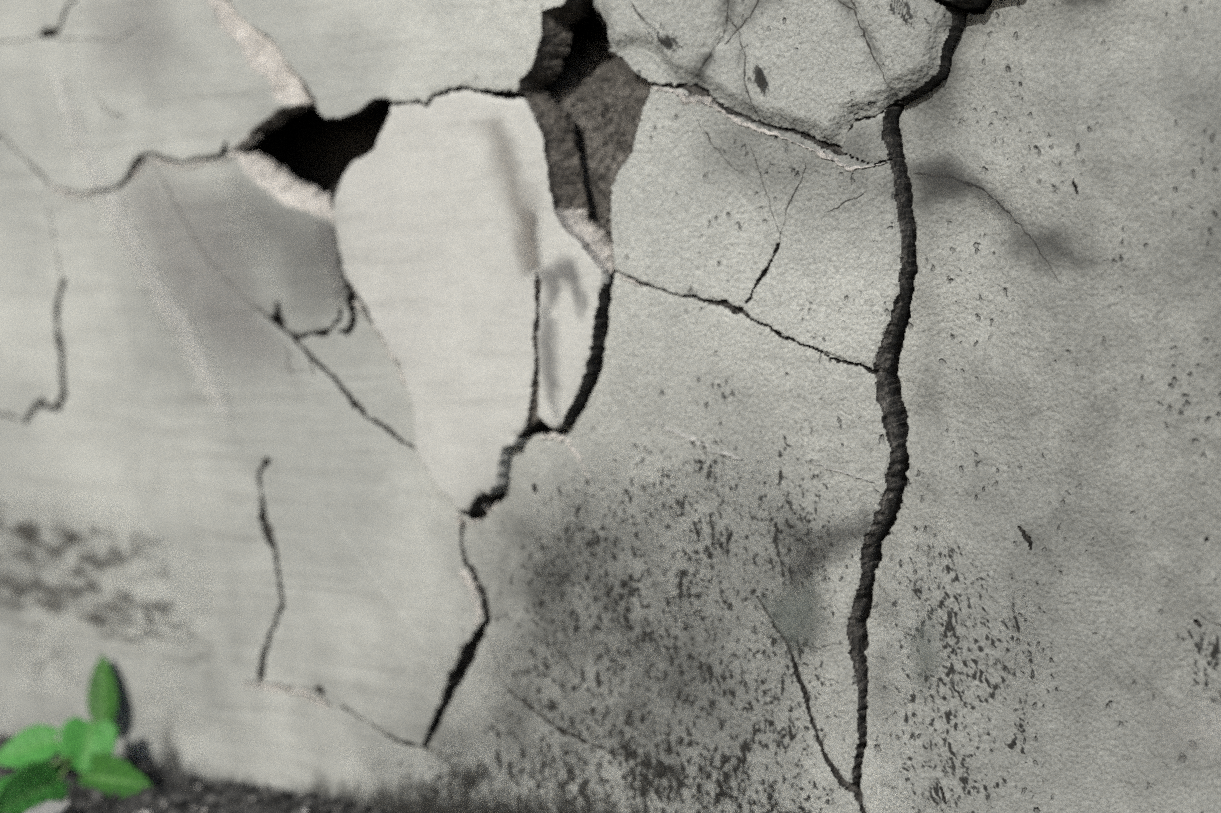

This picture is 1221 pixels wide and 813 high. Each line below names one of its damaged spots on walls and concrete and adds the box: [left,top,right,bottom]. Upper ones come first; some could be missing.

crack [0,0,141,42]
crack [0,134,238,424]
crack [207,0,316,105]
crack [259,233,416,449]
peeling [228,0,656,512]
crack [389,85,529,107]
crack [517,0,993,813]
crack [967,181,1061,284]
crack [242,458,641,756]
leakage [310,411,858,813]
leakage [879,540,1040,813]
leakage [1164,628,1221,708]